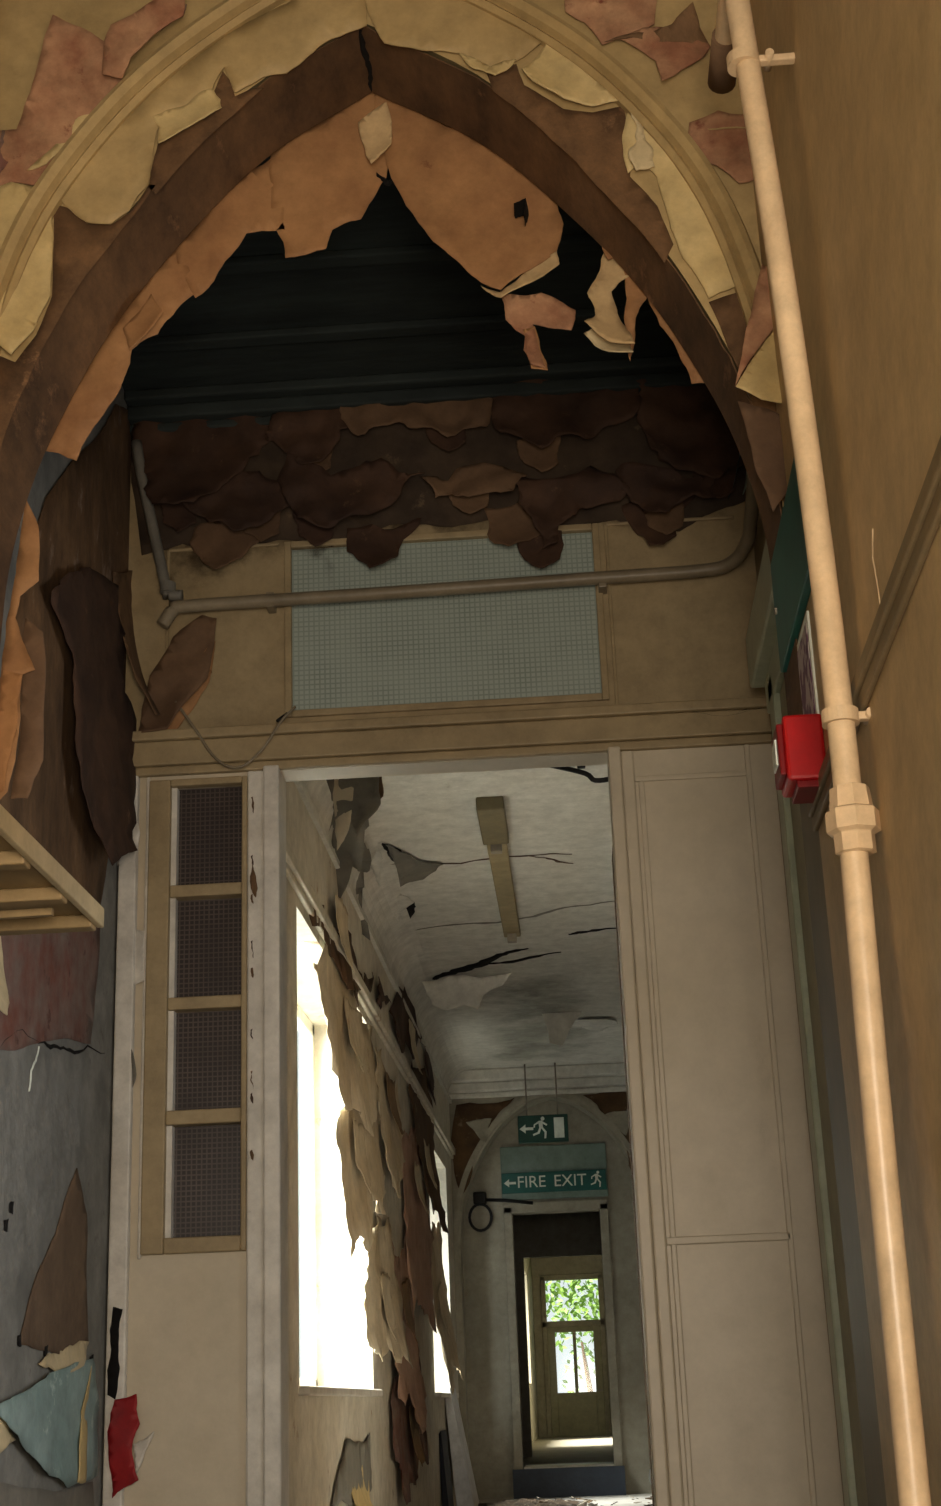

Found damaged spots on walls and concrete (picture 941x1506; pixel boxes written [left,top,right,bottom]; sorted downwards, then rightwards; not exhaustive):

peeling [0,0,754,451]
peeling [748,393,777,413]
peeling [326,413,746,568]
peeling [0,404,306,905]
crack [382,843,573,887]
crack [417,901,616,1010]
peeling [353,1119,372,1193]
spalling [3,1201,14,1232]
peeling [17,1168,123,1399]
peeling [402,1278,418,1343]
peeling [438,1281,450,1335]